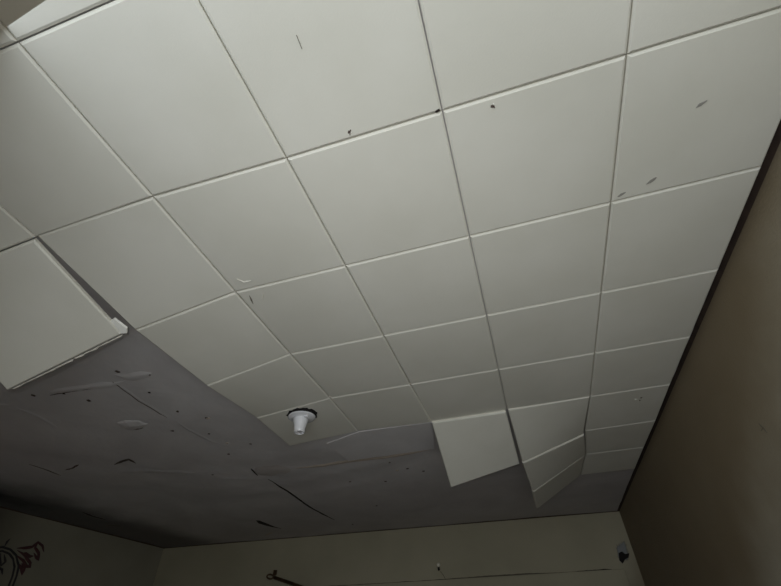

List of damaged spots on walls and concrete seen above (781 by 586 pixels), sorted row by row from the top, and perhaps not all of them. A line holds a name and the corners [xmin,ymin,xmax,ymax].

crack [251,469,334,520]